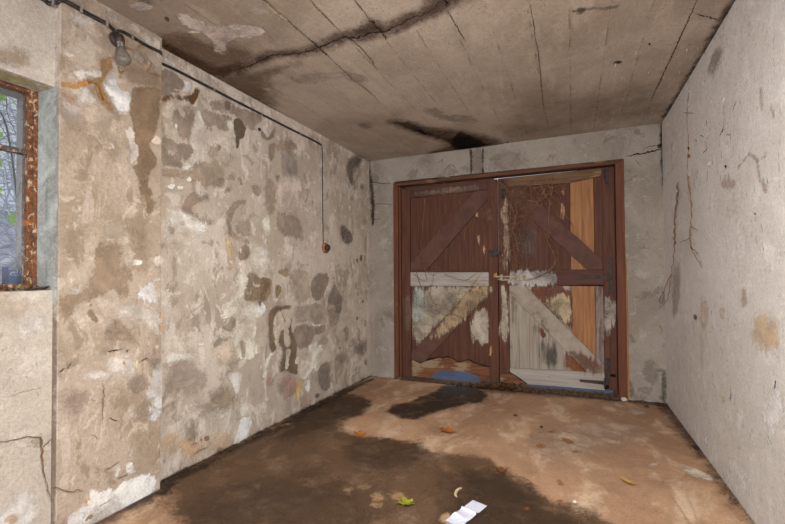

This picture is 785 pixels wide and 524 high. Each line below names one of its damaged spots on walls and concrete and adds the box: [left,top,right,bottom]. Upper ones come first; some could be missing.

rust [61,57,113,111]
peeling [107,11,222,92]
damp [162,13,282,104]
crack [227,0,465,96]
crack [650,4,718,102]
damp [392,108,519,173]
crack [630,145,661,165]
peeling [263,311,323,392]
damp [536,421,642,458]
peeling [67,461,157,524]
damp [344,484,408,508]